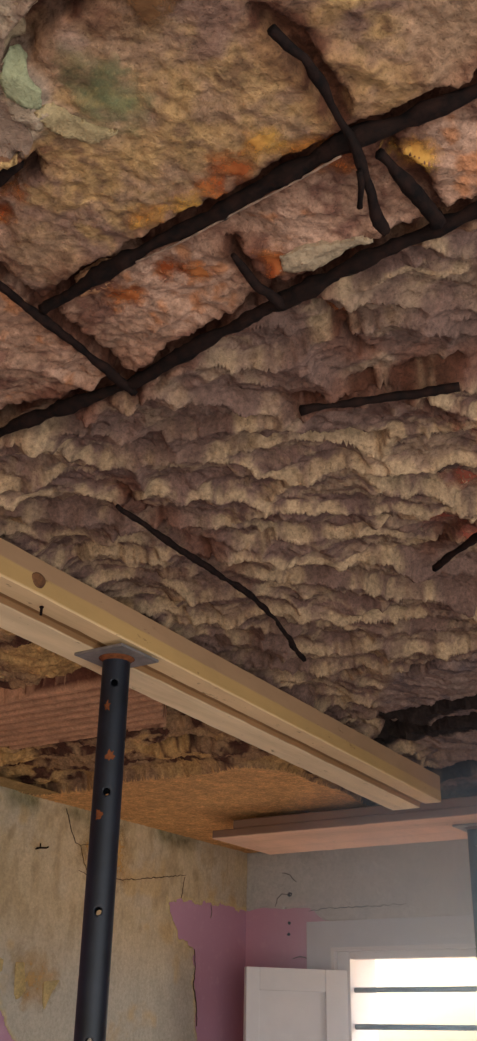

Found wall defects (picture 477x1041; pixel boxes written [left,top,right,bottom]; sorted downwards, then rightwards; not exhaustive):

corrosion [177,132,335,212]
corrosion [259,250,283,279]
spalling [0,0,477,806]
peeling [0,737,101,1041]
peeling [106,819,477,1041]